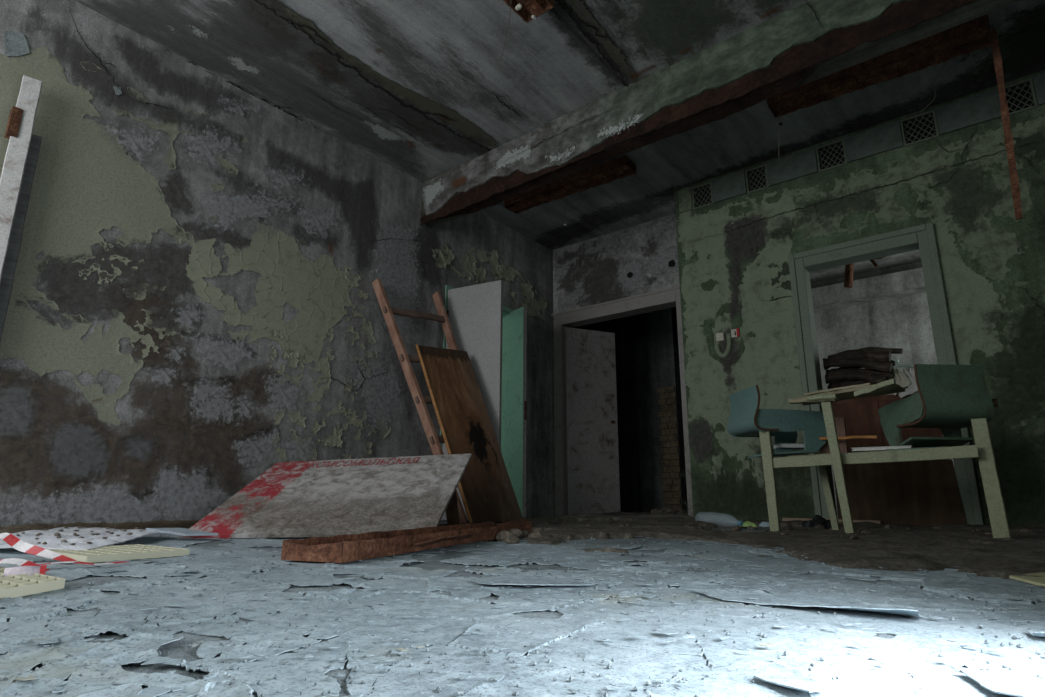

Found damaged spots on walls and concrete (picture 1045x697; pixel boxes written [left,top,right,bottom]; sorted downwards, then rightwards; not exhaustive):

peeling [0,46,391,461]
damp [0,10,441,527]
crack [167,50,325,133]
crack [254,0,608,174]
peeling [432,242,547,321]
crack [556,0,628,87]
spalling [420,0,976,226]
damp [536,0,1045,307]
damp [720,186,878,387]
damp [685,443,815,521]
damp [988,296,1045,526]
peeling [0,533,1045,697]